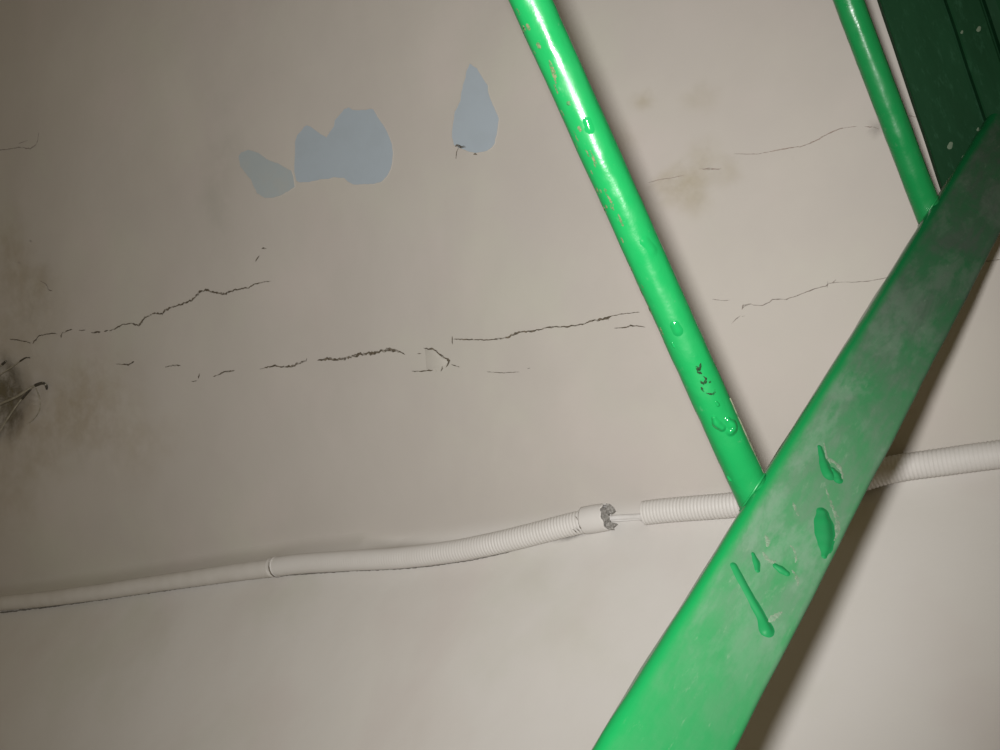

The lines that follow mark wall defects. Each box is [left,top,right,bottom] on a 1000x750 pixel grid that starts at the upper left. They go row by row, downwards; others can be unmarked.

peeling [238,107,394,199]
peeling [451,63,500,157]
crack [741,126,871,154]
crack [10,247,269,343]
crack [265,312,643,372]
crack [714,277,887,324]